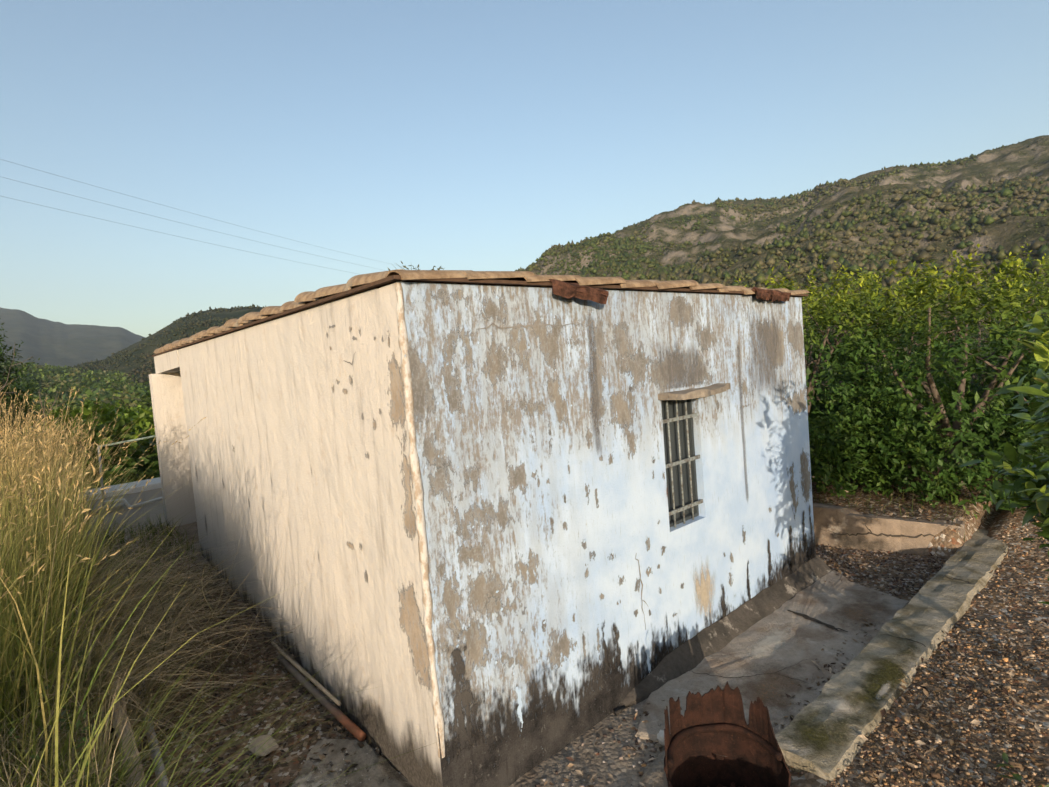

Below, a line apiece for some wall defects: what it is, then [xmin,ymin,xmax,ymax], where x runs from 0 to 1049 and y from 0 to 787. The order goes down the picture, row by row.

spalling [548,279,609,304]
spalling [752,286,791,302]
peeling [757,319,804,369]
peeling [782,382,807,414]
peeling [361,289,719,699]
peeling [789,452,811,519]
crack [821,525,935,538]
crack [787,610,848,632]
damp [201,506,816,787]
damp [828,700,849,710]